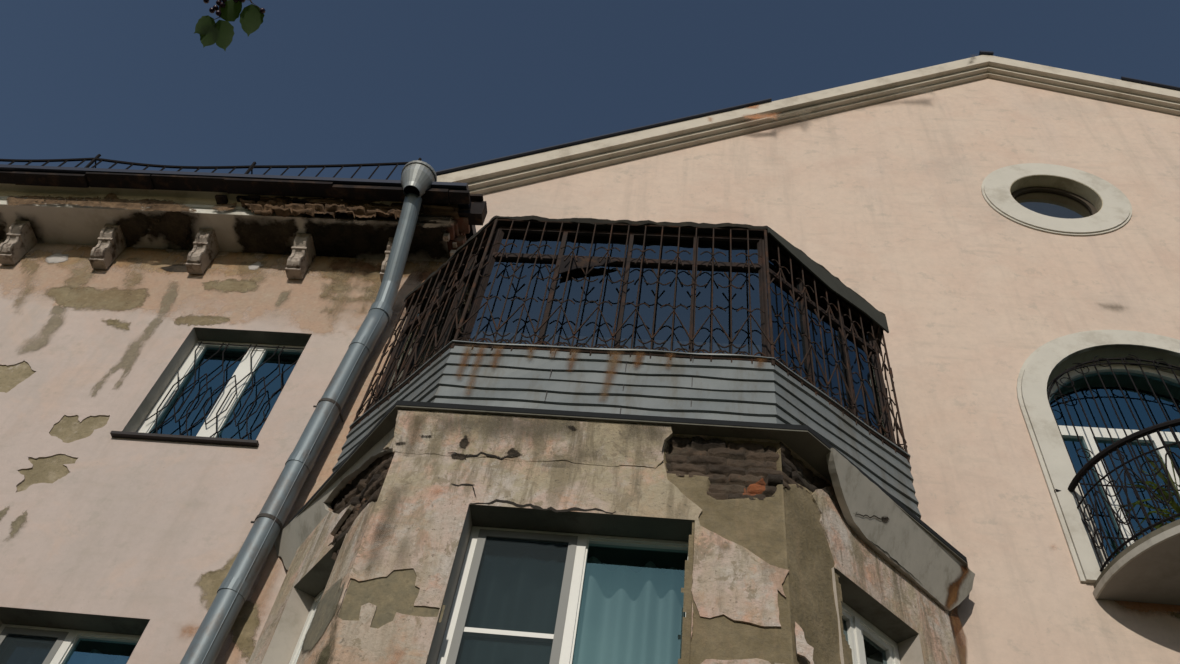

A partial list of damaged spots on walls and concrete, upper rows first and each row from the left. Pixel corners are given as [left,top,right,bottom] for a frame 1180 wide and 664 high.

flaking render [212,196,404,219]
leakage [0,211,398,333]
peeling [0,264,230,396]
leakage [283,220,450,529]
peeling [17,416,110,492]
flaking render [328,442,405,562]
crack [448,452,616,514]
leakage [224,642,241,664]
spalling [231,601,260,662]
leakage [251,547,280,609]
flaking render [301,569,446,652]
flaking render [664,436,853,664]